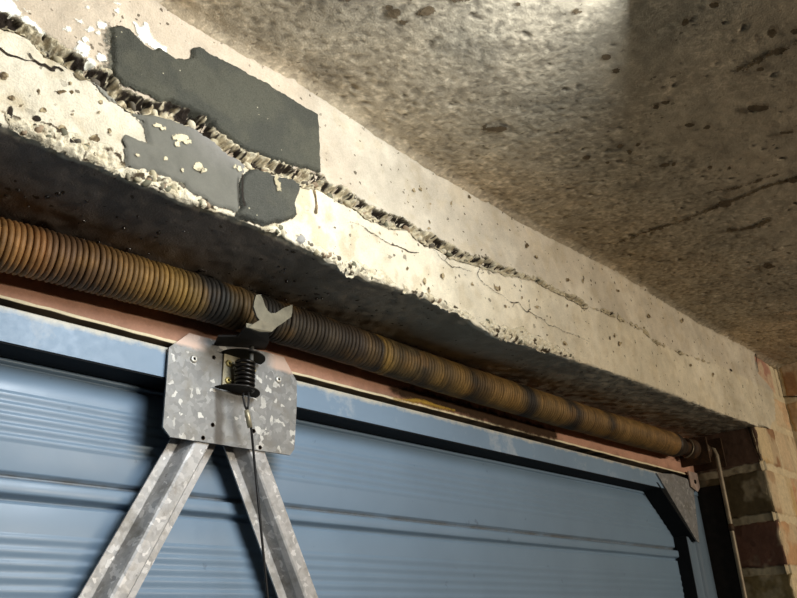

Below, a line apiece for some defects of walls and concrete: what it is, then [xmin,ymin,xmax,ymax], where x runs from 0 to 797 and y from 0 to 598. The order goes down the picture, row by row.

crack [732,29,796,72]
spalling [3,95,218,210]
spalling [254,224,287,238]
crack [0,12,711,363]
crack [618,174,797,243]